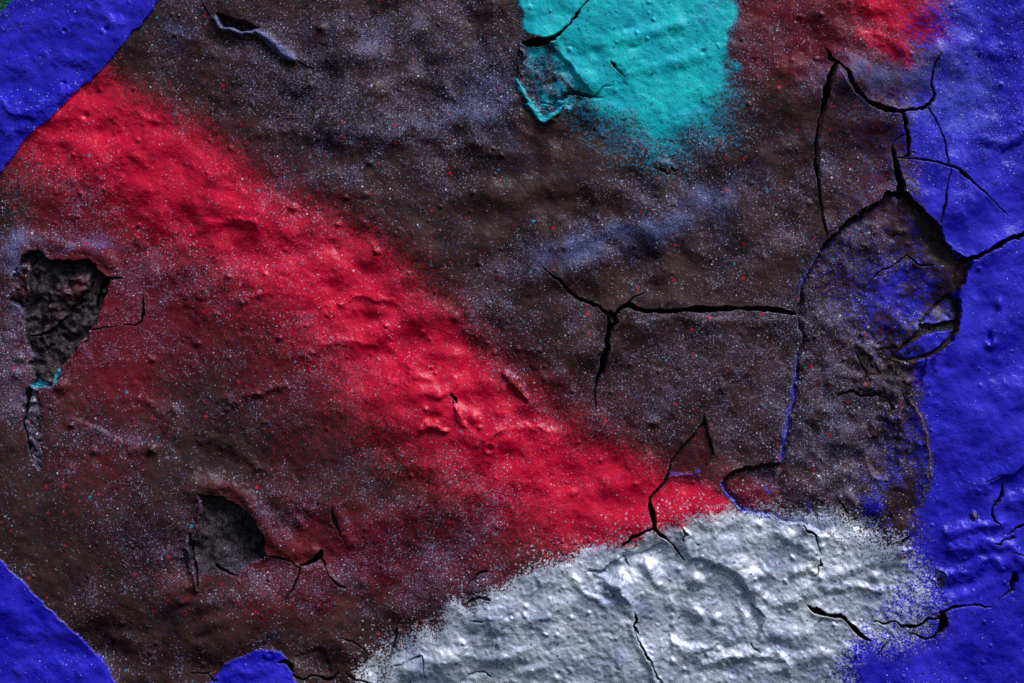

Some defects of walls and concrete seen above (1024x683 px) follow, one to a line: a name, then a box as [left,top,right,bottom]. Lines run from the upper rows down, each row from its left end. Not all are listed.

peeling [515,0,617,125]
crack [812,46,1024,265]
spalling [10,250,146,471]
crack [541,265,797,411]
spalling [184,493,266,593]
crack [619,414,716,562]
crack [984,474,1024,557]
crack [806,586,1015,660]